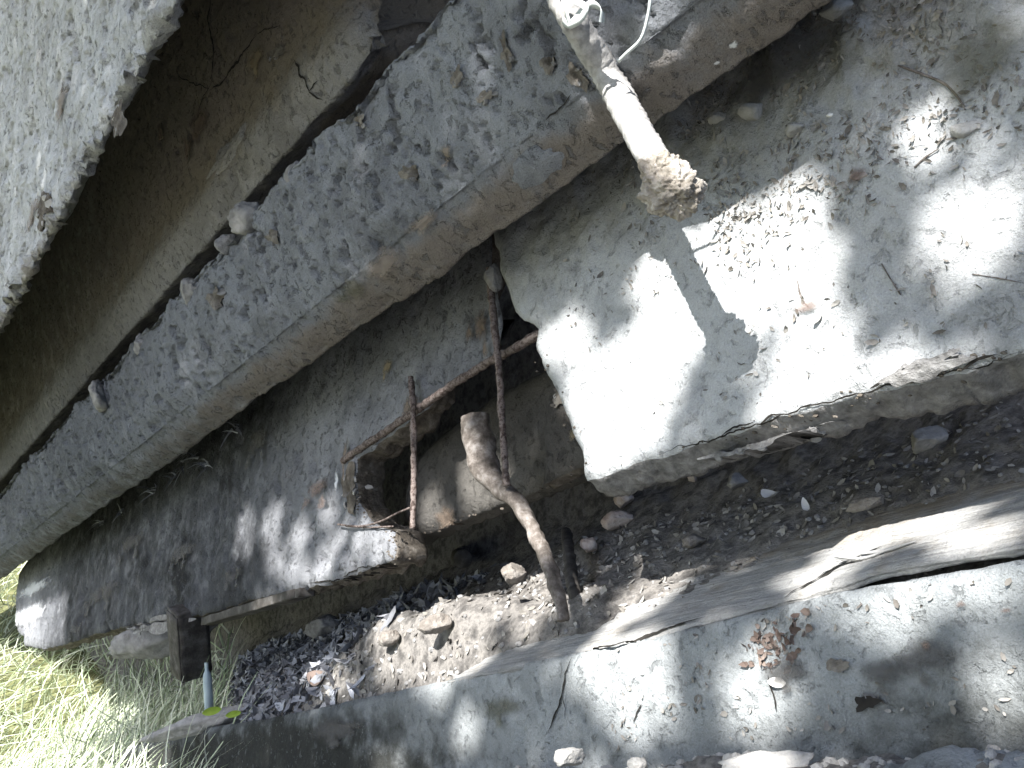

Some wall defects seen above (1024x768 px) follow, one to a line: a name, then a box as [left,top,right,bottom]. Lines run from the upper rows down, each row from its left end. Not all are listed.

crack [179,0,279,113]
crack [294,60,322,100]
spalling [341,461,373,515]
rust [438,508,465,526]
crack [548,617,702,732]